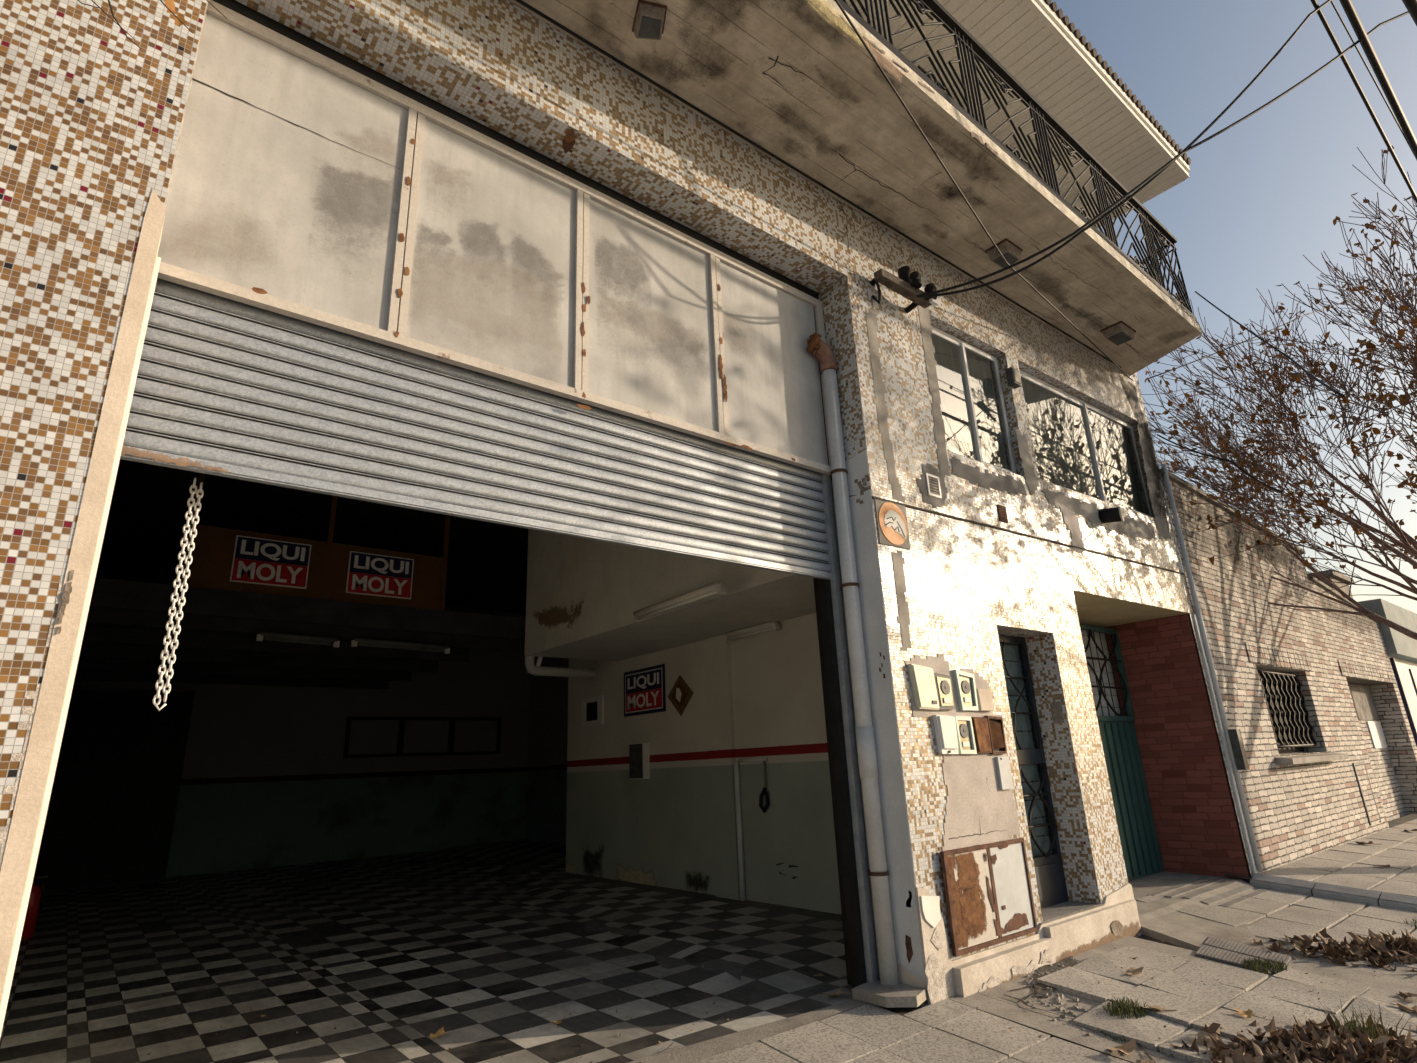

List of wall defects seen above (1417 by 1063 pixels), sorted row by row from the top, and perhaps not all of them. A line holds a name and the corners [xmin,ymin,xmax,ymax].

crack [762,56,821,91]
crack [192,78,399,169]
rust [581,282,591,356]
rust [719,337,727,402]
peeling [533,601,584,629]
rust [943,845,1029,949]